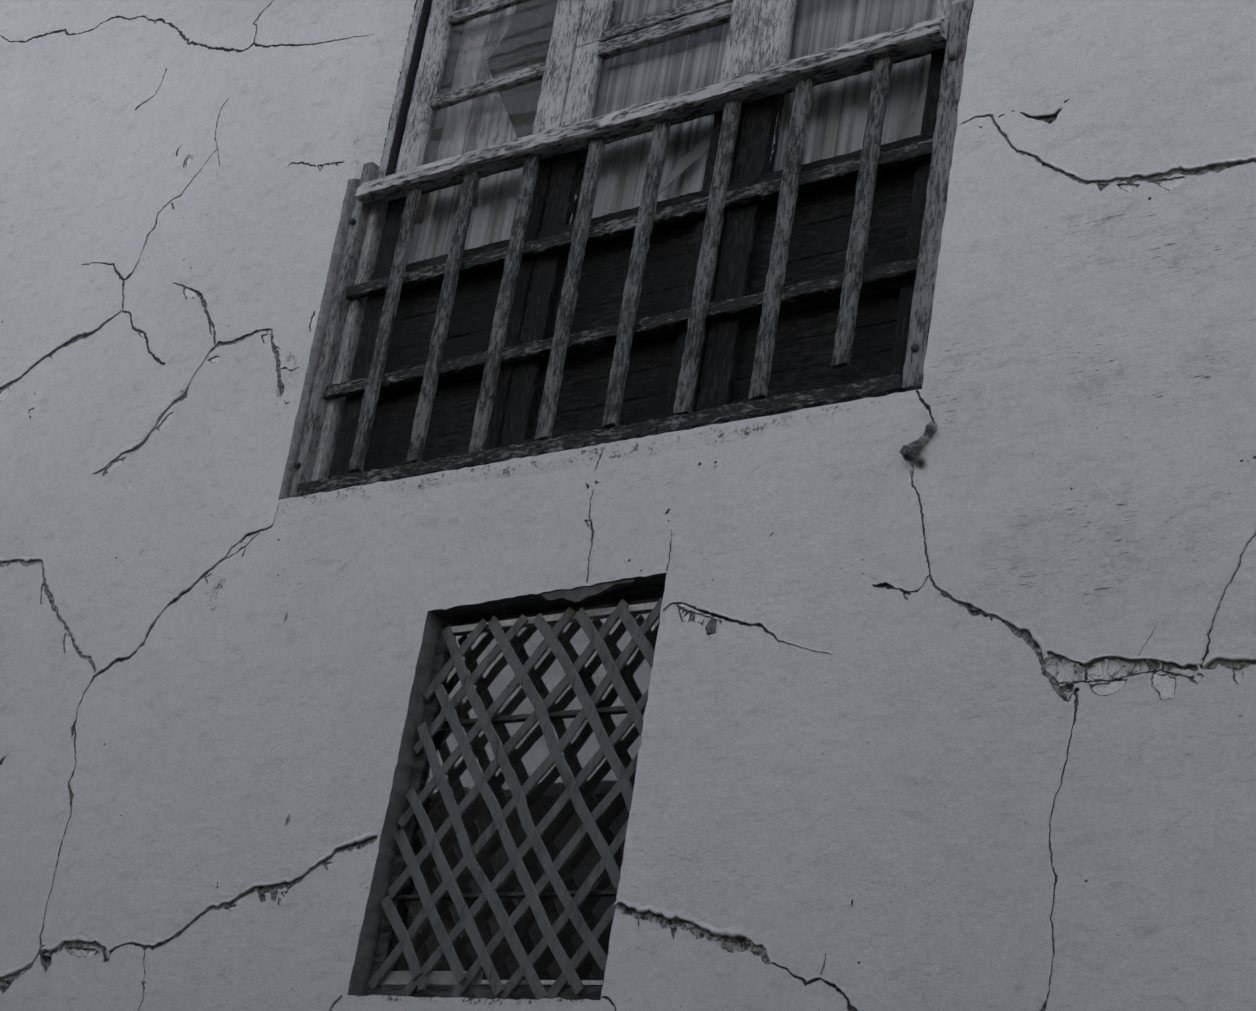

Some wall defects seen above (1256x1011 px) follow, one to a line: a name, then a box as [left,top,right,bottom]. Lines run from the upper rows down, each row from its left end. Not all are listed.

crack [286,161,344,171]
crack [958,99,1256,193]
crack [0,98,299,477]
crack [916,390,934,421]
crack [662,509,832,655]
crack [0,502,378,1011]
crack [872,465,1256,1011]
crack [614,898,861,1011]